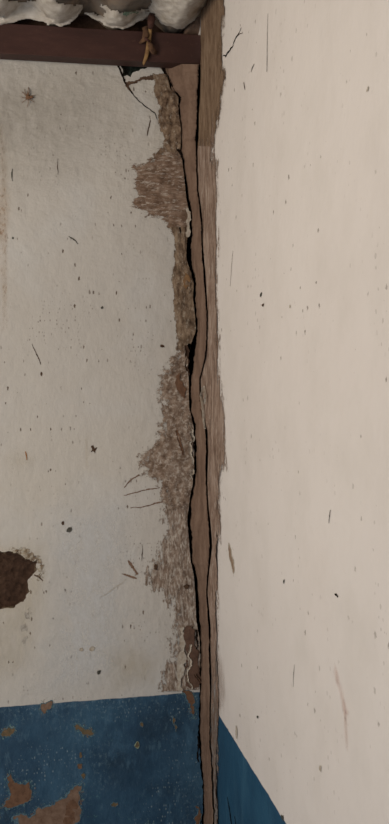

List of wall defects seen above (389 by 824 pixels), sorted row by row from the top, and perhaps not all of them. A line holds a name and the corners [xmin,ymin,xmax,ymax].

crack [117,65,214,824]
flaking render [121,0,235,824]
spalling [0,547,46,644]
peeling [38,699,56,715]
peeling [0,752,86,824]